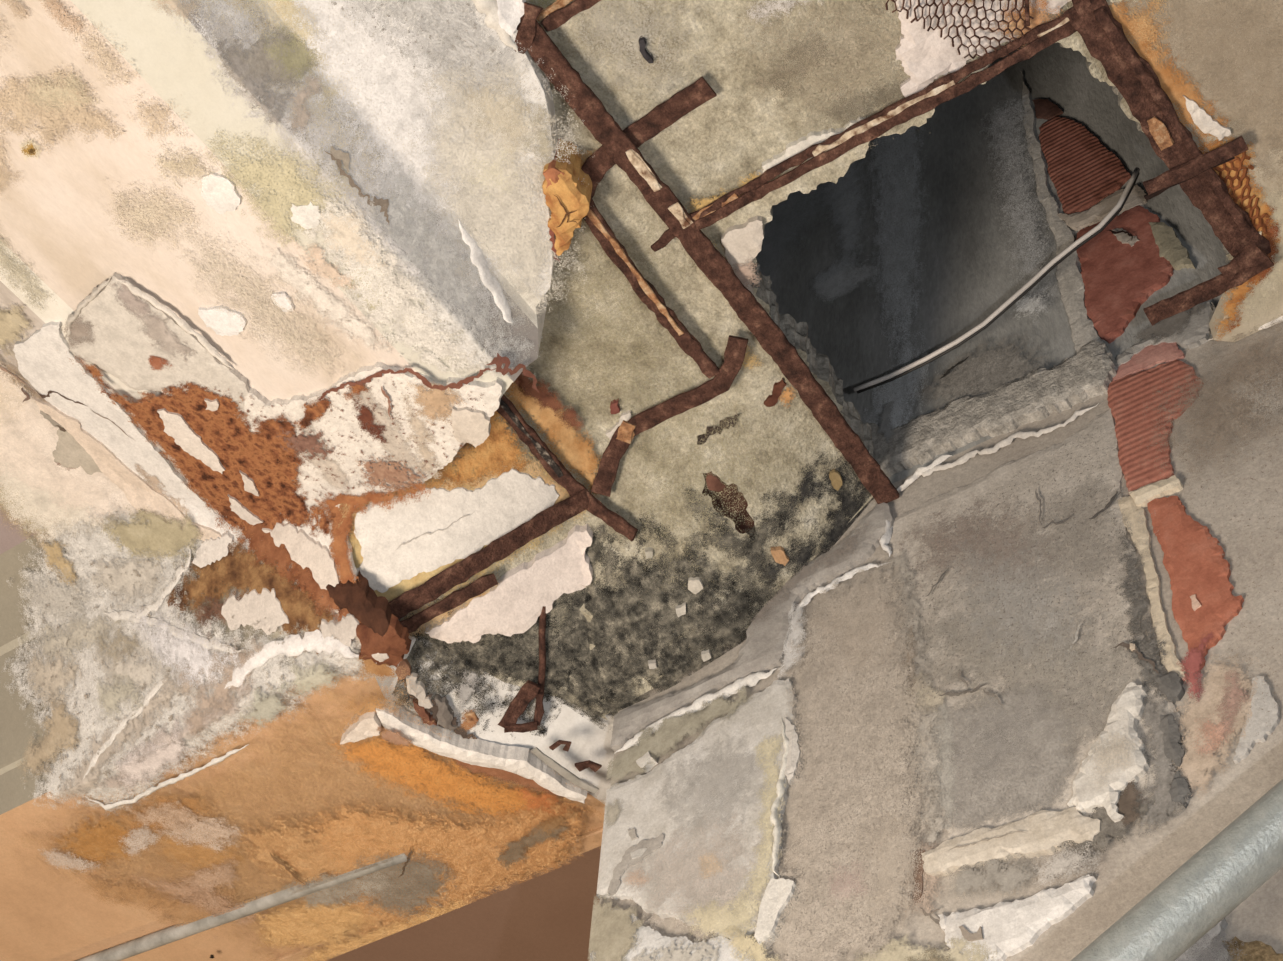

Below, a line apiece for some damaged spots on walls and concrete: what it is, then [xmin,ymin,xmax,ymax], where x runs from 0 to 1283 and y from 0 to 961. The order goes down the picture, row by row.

corrosion [687,169,764,212]
corrosion [1107,0,1283,340]
spalling [57,272,250,411]
peeling [157,408,340,590]
corrosion [69,351,601,681]
leakage [1,381,874,961]
spalling [259,0,935,720]
corrosion [771,546,789,566]
corrosion [764,378,797,407]
flaking render [889,342,1283,961]
peeling [596,678,805,961]
leakage [853,935,997,961]